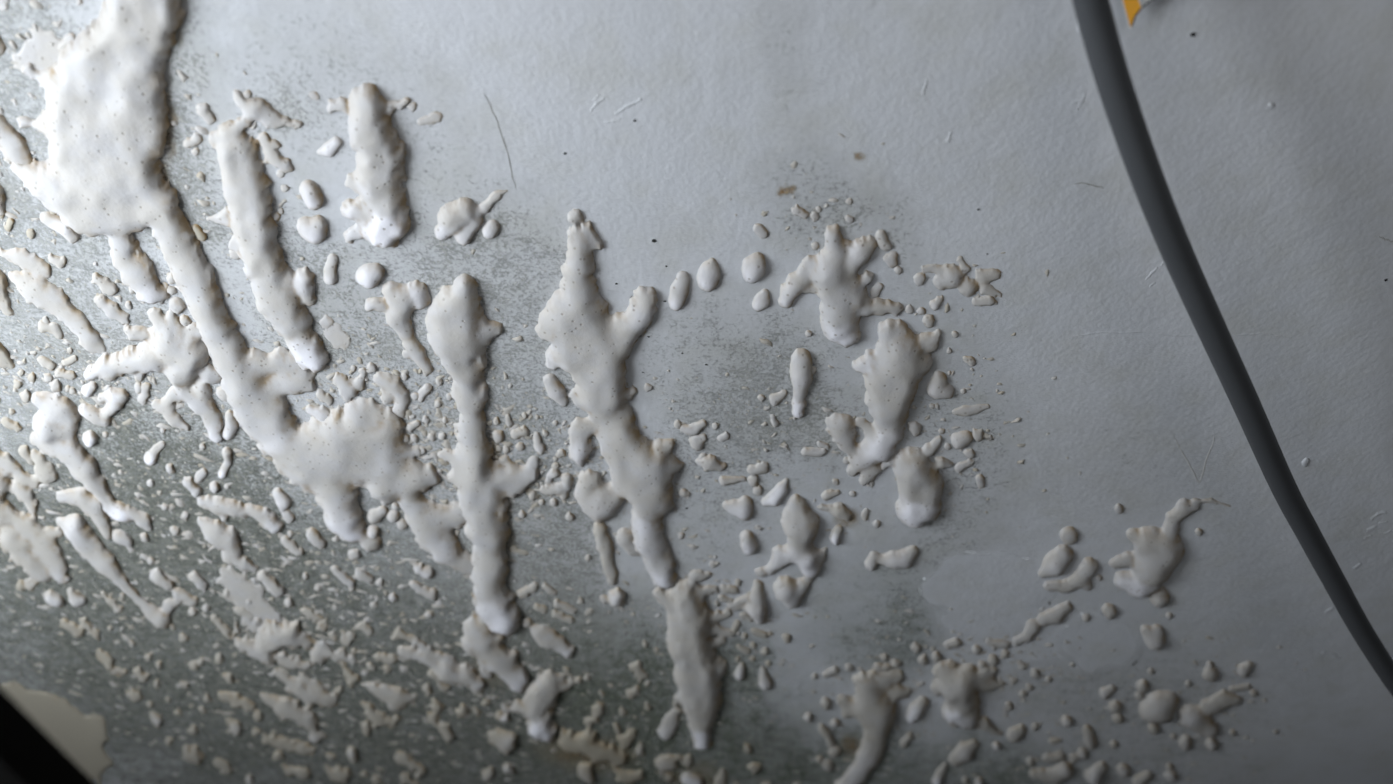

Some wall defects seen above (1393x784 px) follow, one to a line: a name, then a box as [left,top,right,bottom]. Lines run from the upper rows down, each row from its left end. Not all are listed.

water stain [0,0,863,784]
water stain [985,600,1073,649]